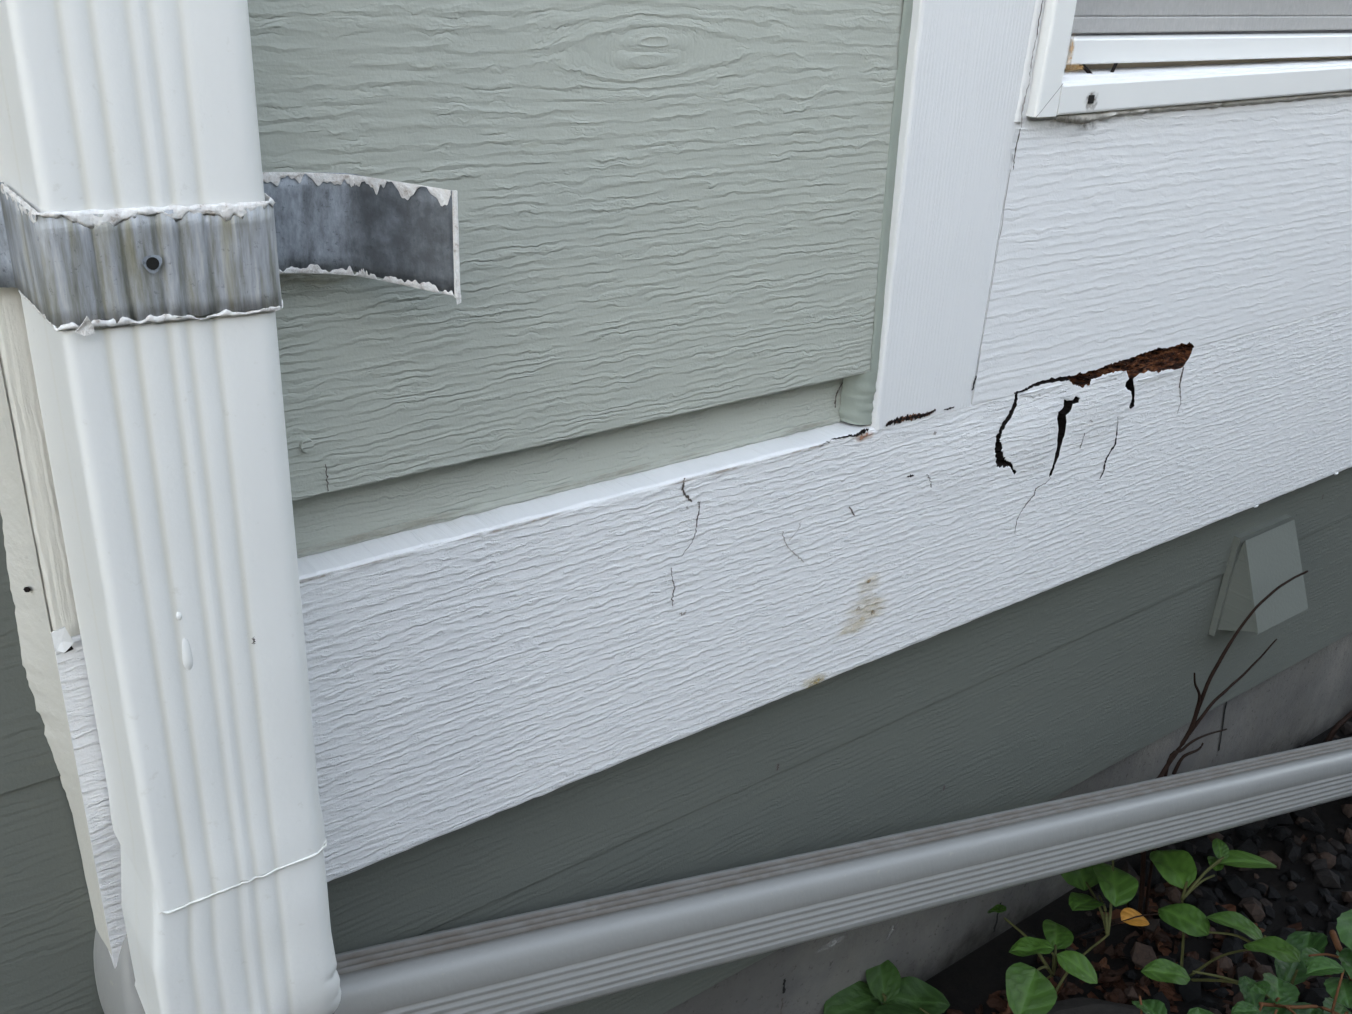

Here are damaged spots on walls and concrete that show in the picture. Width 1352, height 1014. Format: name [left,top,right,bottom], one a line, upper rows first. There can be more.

crack [995,376,1071,530]
crack [1080,417,1118,478]